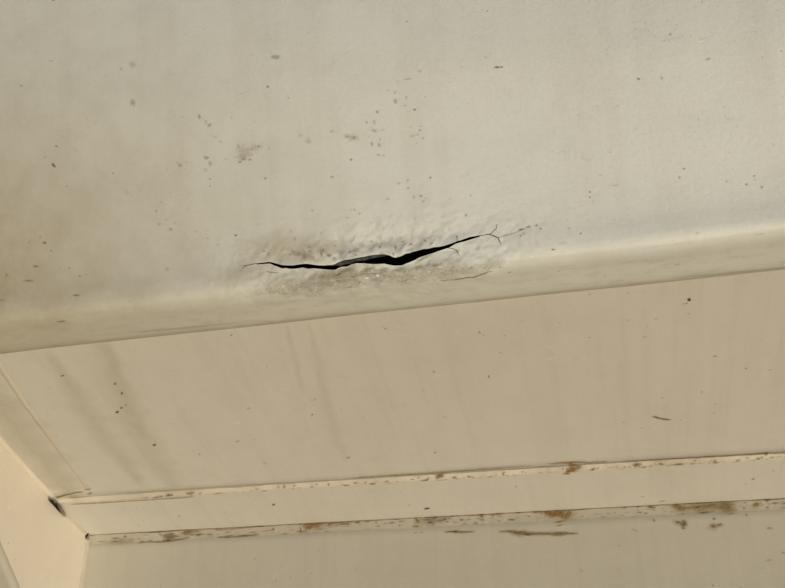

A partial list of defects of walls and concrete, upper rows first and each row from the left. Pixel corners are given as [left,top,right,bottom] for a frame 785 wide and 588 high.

crack [242,226,521,273]